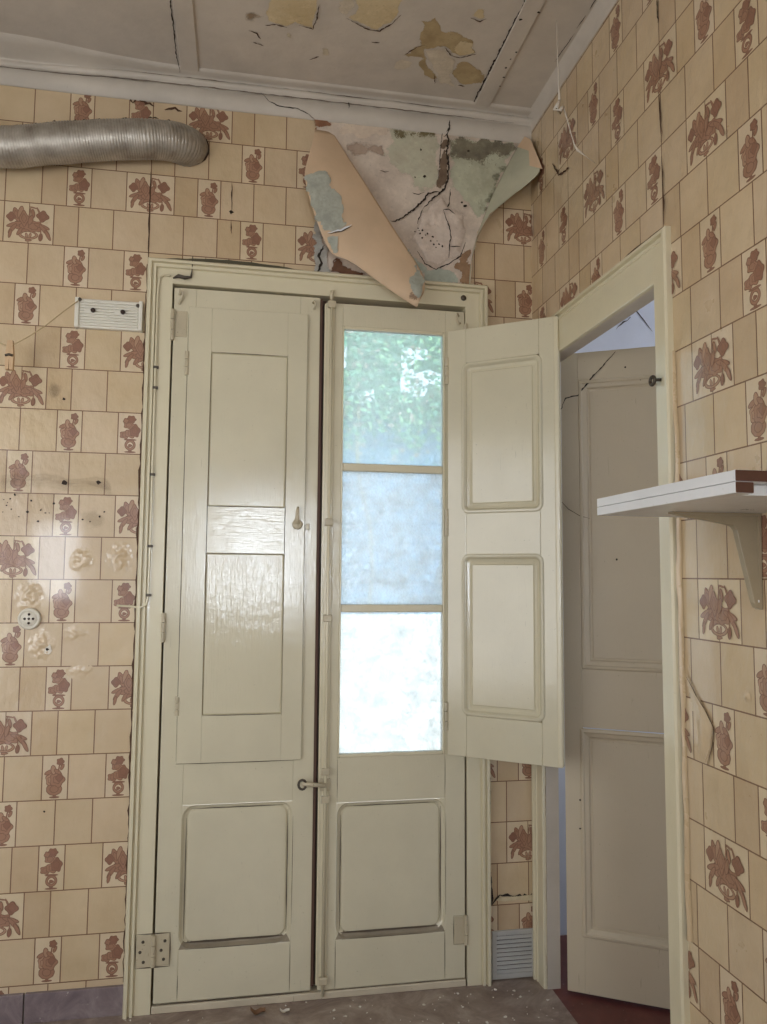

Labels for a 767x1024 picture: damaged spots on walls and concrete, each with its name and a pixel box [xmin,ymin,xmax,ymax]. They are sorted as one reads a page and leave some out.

peeling [266,0,319,29]
peeling [393,18,485,87]
crack [474,0,525,102]
peeling [304,171,370,276]
crack [392,121,460,252]
peeling [314,119,542,298]